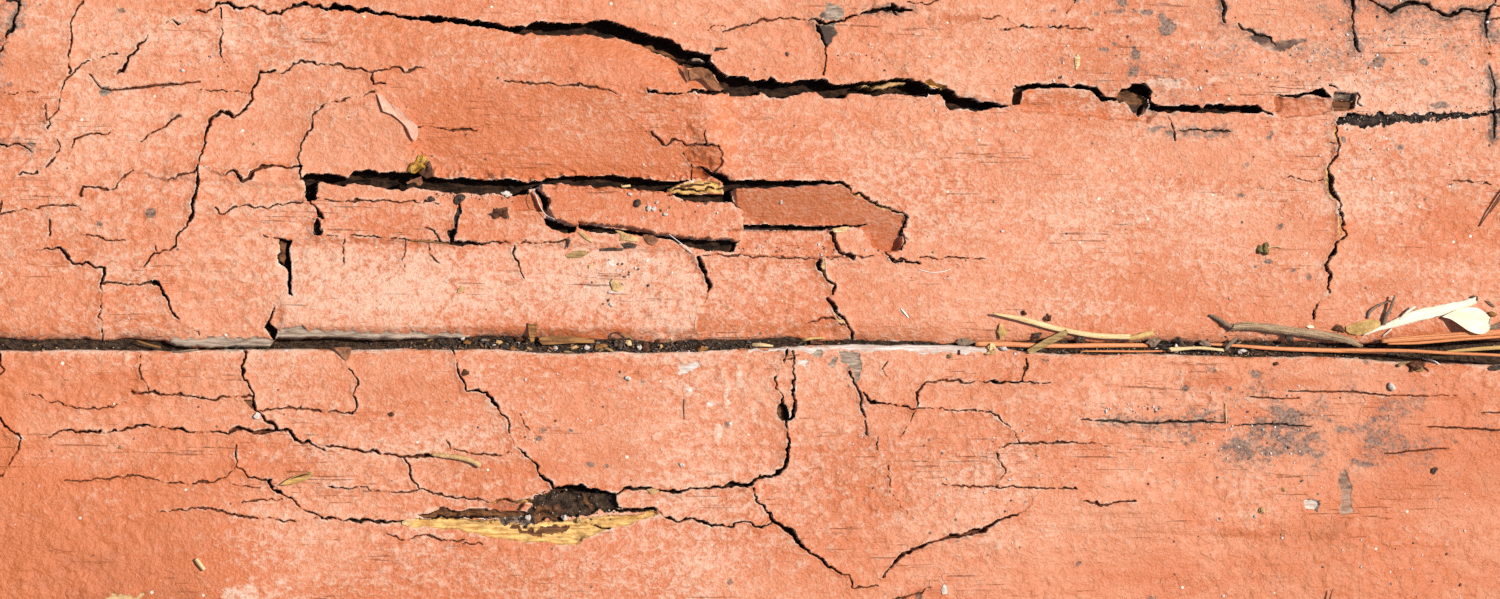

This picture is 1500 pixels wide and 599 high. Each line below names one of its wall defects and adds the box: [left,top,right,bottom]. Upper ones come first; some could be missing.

peeling [538,183,905,252]
crack [0,0,1500,340]
crack [0,350,554,545]
peeling [493,499,524,512]